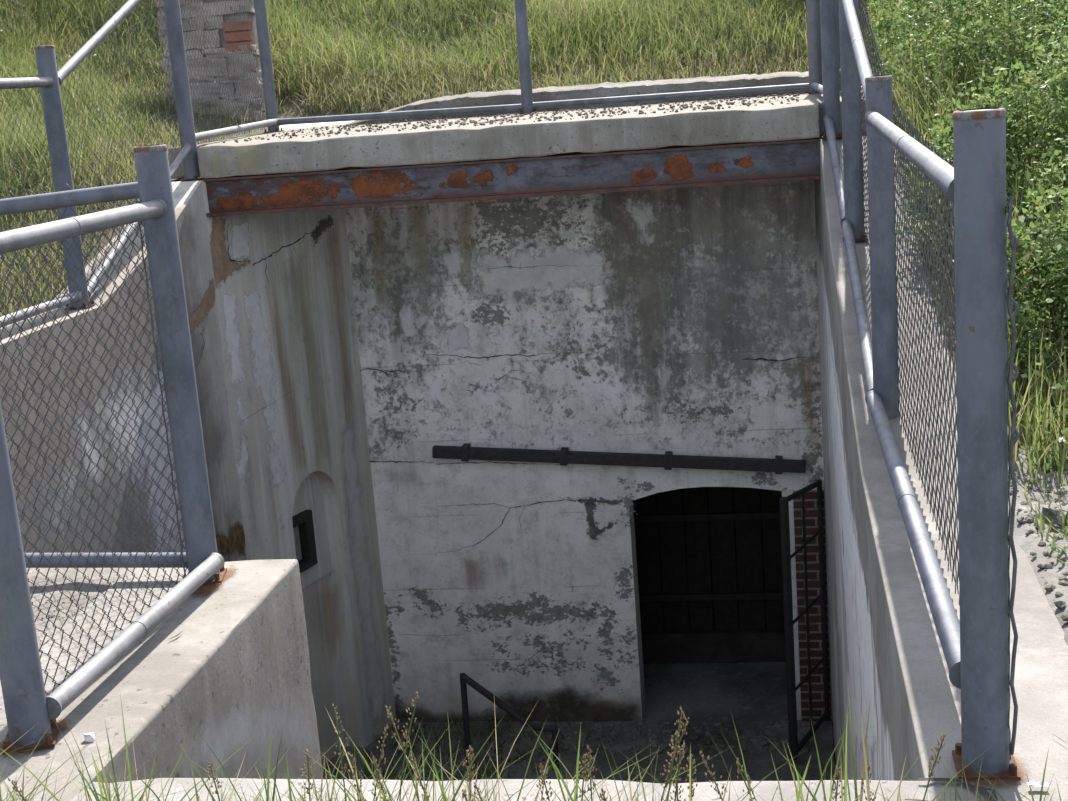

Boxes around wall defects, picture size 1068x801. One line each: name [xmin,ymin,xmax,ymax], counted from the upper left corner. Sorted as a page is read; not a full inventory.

corrosion [217,169,415,210]
corrosion [439,165,523,188]
corrosion [631,155,694,185]
corrosion [708,157,754,173]
peeling [464,196,603,260]
crack [227,223,319,282]
peeling [399,294,417,337]
peeling [469,294,513,331]
crack [360,352,577,392]
peeling [545,300,611,409]
crack [412,499,602,555]
peeling [384,566,638,709]